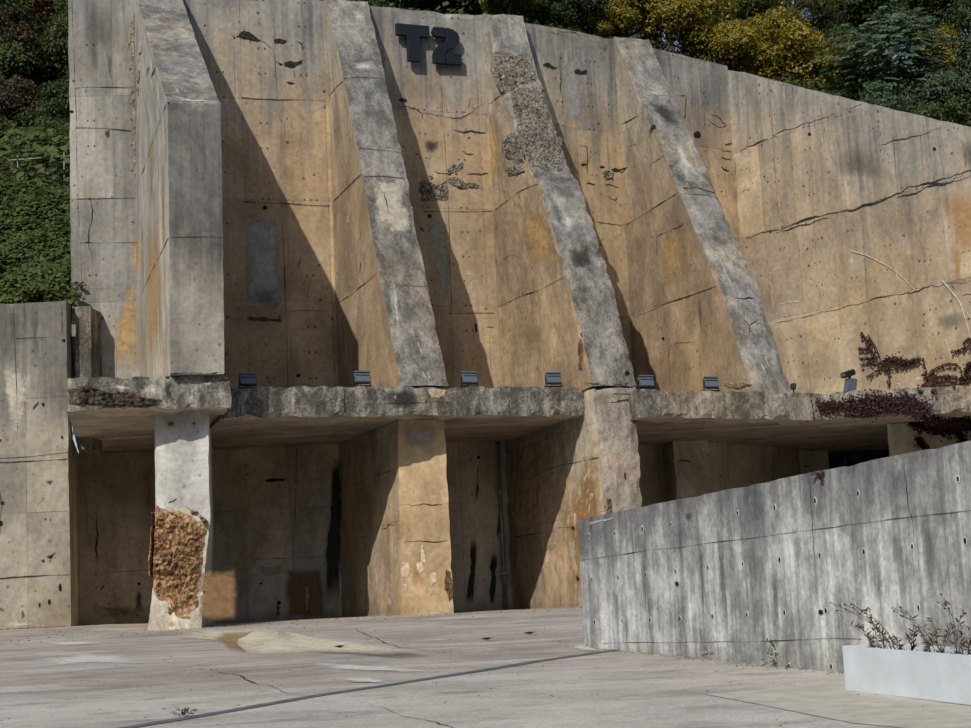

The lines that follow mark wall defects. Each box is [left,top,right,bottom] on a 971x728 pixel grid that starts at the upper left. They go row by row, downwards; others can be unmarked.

spalling [490,50,564,177]
crack [711,104,861,171]
crack [882,127,942,145]
peeling [375,182,408,231]
spalling [418,162,483,202]
crack [746,170,971,238]
crack [735,267,971,339]
spalling [68,385,162,408]
leakage [326,464,342,591]
spalling [148,505,208,619]
leakage [467,544,476,600]
leakage [489,556,497,602]